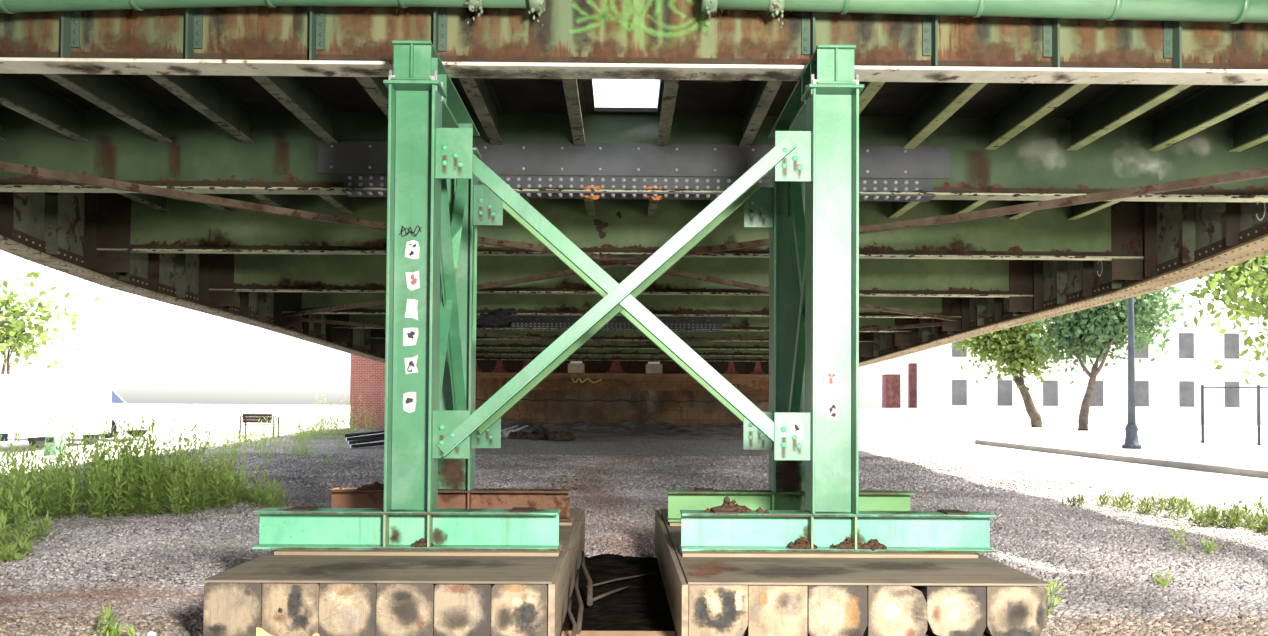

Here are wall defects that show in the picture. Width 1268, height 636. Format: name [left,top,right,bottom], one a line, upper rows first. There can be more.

corrosion [47,8,179,74]
corrosion [213,6,302,60]
corrosion [302,6,425,76]
corrosion [451,0,552,73]
corrosion [574,0,701,79]
corrosion [718,9,801,77]
corrosion [832,12,918,66]
corrosion [955,16,1042,67]
corrosion [1078,19,1164,68]
corrosion [1195,21,1268,84]
corrosion [260,436,568,551]
corrosion [671,438,998,576]